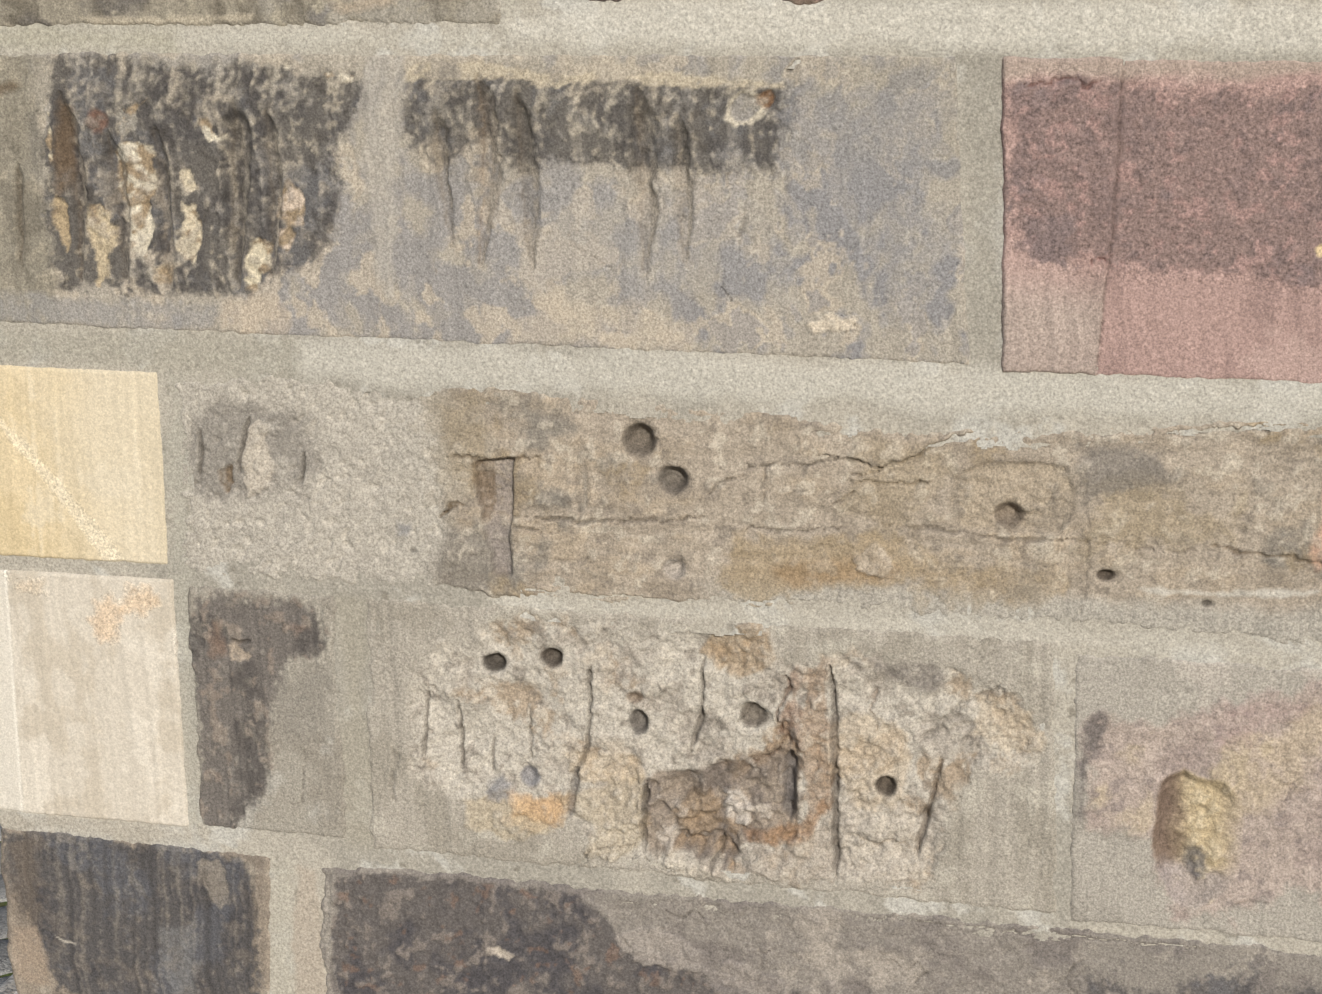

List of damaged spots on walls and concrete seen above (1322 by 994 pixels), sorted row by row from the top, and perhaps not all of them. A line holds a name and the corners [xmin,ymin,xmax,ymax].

crack [1019,59,1130,375]
crack [940,429,1029,448]
crack [441,447,545,466]
crack [435,498,468,523]
crack [506,448,1078,549]
crack [1108,543,1313,570]
crack [515,584,699,603]
spalling [398,606,1120,994]
spalling [1075,671,1322,931]